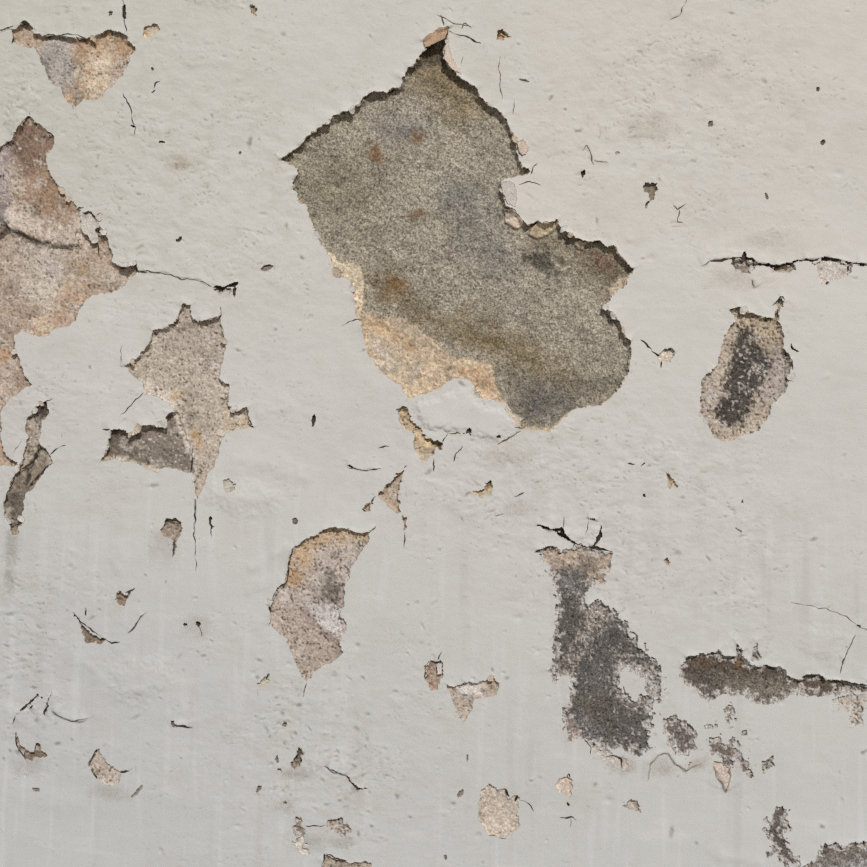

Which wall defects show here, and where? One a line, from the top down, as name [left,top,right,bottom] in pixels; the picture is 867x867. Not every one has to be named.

peeling [11,20,136,108]
crack [120,2,128,32]
peeling [0,112,147,535]
peeling [101,303,254,528]
spalling [281,16,675,471]
peeling [700,296,796,441]
crack [702,251,867,287]
peeling [160,518,183,557]
peeling [266,526,376,696]
spalling [535,542,867,793]
peeling [478,784,533,839]
spalling [762,806,867,867]